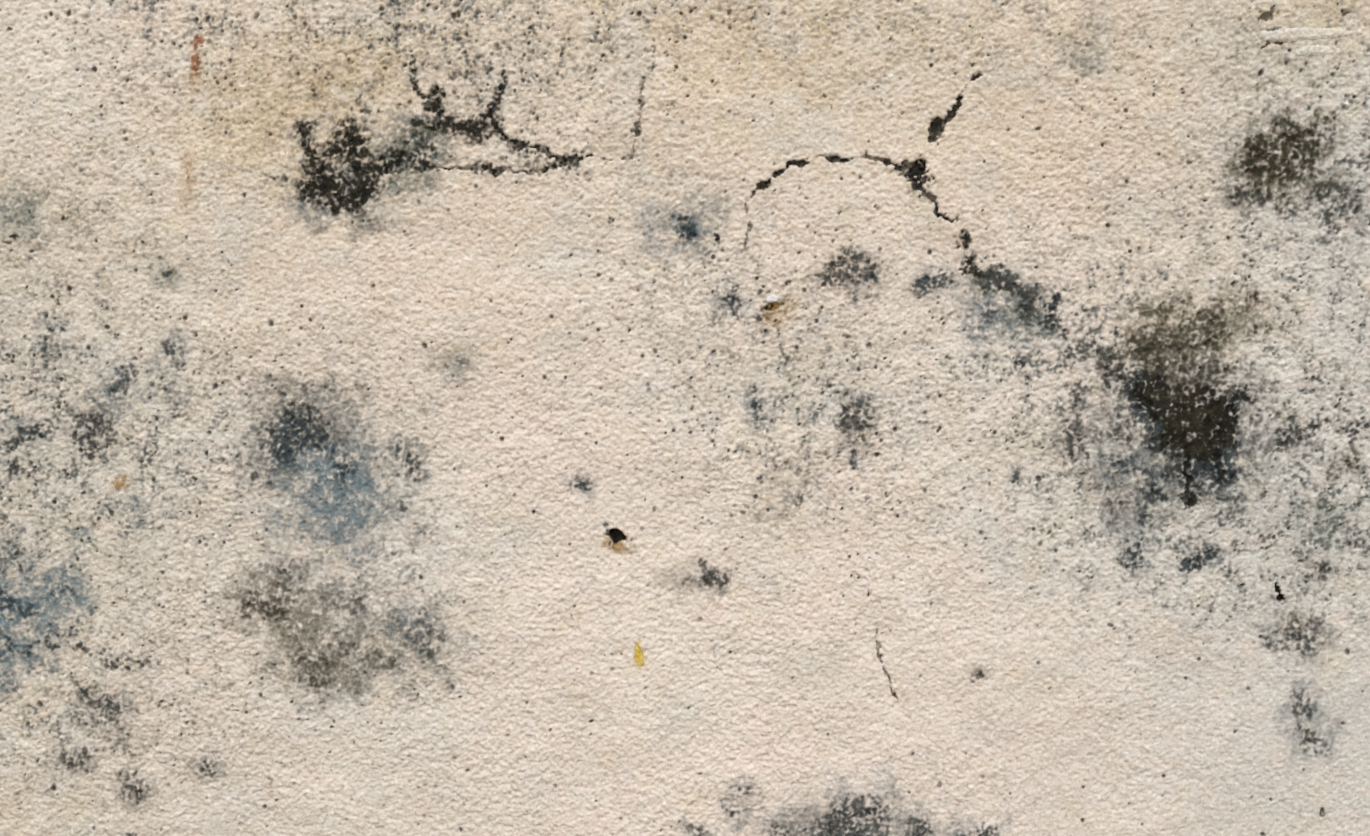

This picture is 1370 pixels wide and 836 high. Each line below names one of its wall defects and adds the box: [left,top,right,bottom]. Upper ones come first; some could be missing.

crack [441,39,655,177]
crack [744,51,1016,246]
mould [1230,114,1360,244]
mould [914,230,1263,527]
mould [251,384,407,541]
mould [0,548,86,688]
mould [245,570,436,694]
mould [1181,545,1220,571]
mould [775,796,889,836]
mould [907,818,931,836]